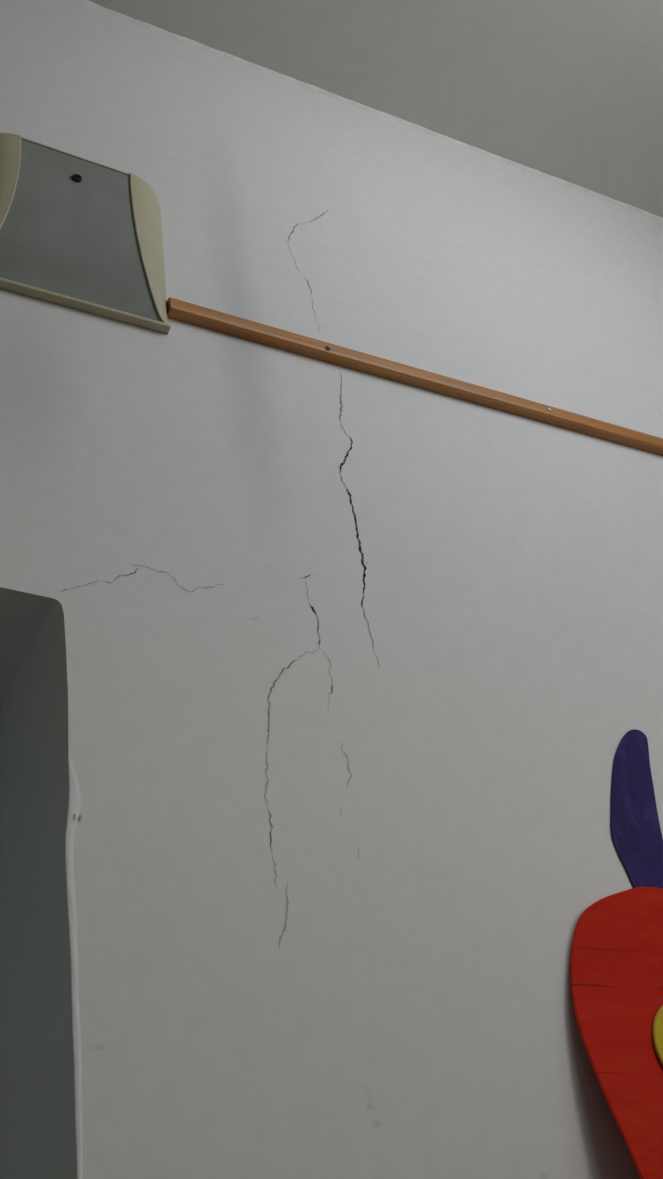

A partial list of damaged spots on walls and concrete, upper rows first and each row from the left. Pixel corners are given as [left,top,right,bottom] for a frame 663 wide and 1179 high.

crack [339,372,374,650]
crack [267,574,320,732]